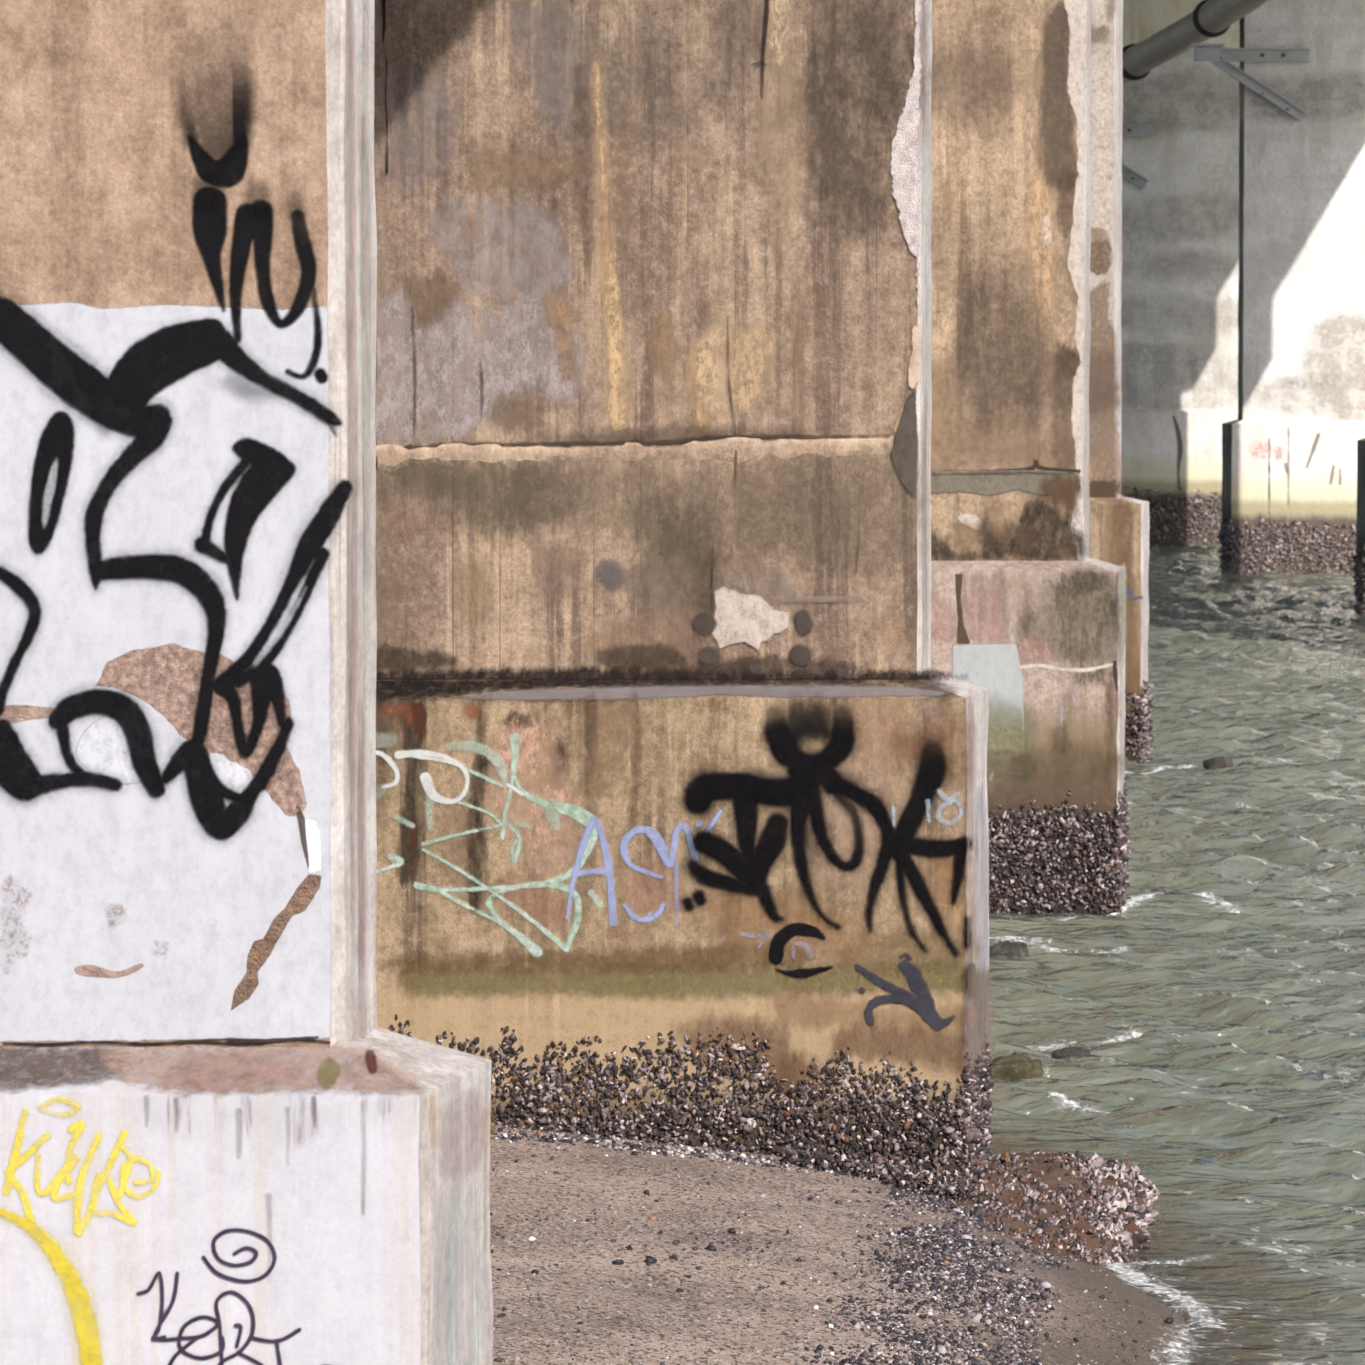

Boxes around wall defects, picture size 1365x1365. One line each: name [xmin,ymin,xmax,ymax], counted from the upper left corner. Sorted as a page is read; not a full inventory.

crack [381,0,389,174]
crack [752,0,769,98]
peeling [890,0,922,389]
peeling [1064,0,1123,561]
crack [376,311,891,482]
water stain [931,0,1140,740]
crack [708,564,716,613]
spalling [0,705,55,723]
spalling [76,717,141,785]
spalling [96,643,321,1010]
water stain [987,712,1032,777]
peeling [1,876,30,964]